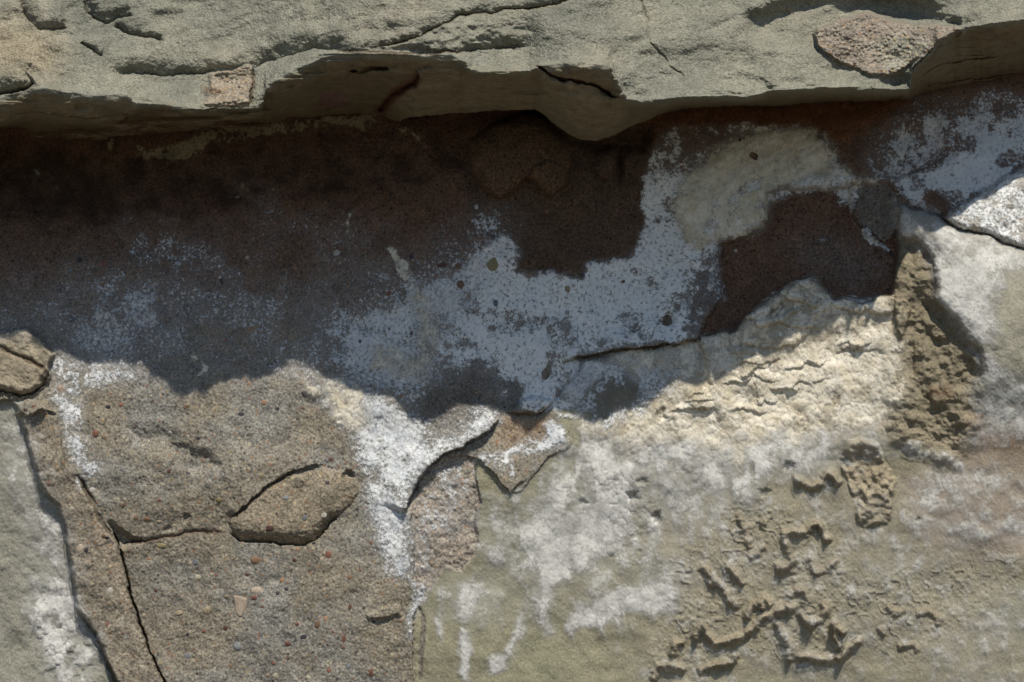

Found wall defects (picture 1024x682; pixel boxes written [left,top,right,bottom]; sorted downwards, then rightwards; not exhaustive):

peeling [466,122,653,278]
spalling [681,186,911,410]
leakage [32,88,1024,638]
crack [554,332,736,400]
crack [407,434,486,511]
crack [538,445,570,472]
spalling [839,439,896,527]
leakage [4,422,98,682]
crack [70,472,296,682]
leakage [438,580,504,680]
leakage [488,615,525,674]